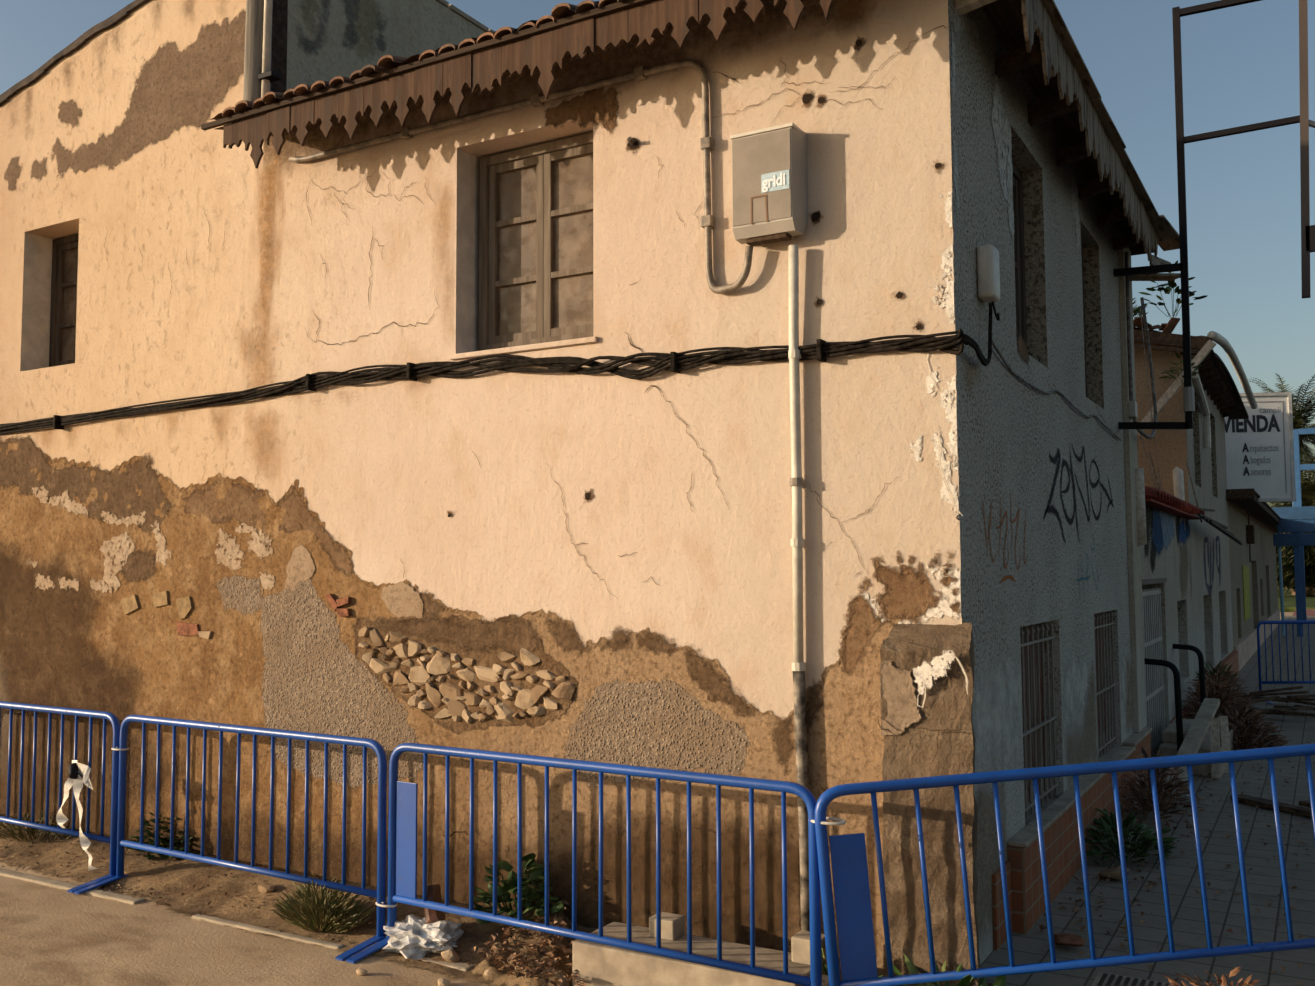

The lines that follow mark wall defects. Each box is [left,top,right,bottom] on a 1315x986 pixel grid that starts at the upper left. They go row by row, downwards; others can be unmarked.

water stain [263,0,860,162]
flaking render [545,87,619,133]
spalling [626,137,640,153]
crack [713,25,947,118]
crack [306,172,438,345]
spalling [930,138,960,324]
crack [645,385,728,511]
spalling [909,347,963,521]
crack [546,463,658,597]
water stain [0,553,388,889]
flaking render [0,436,961,977]
water stain [417,818,800,951]